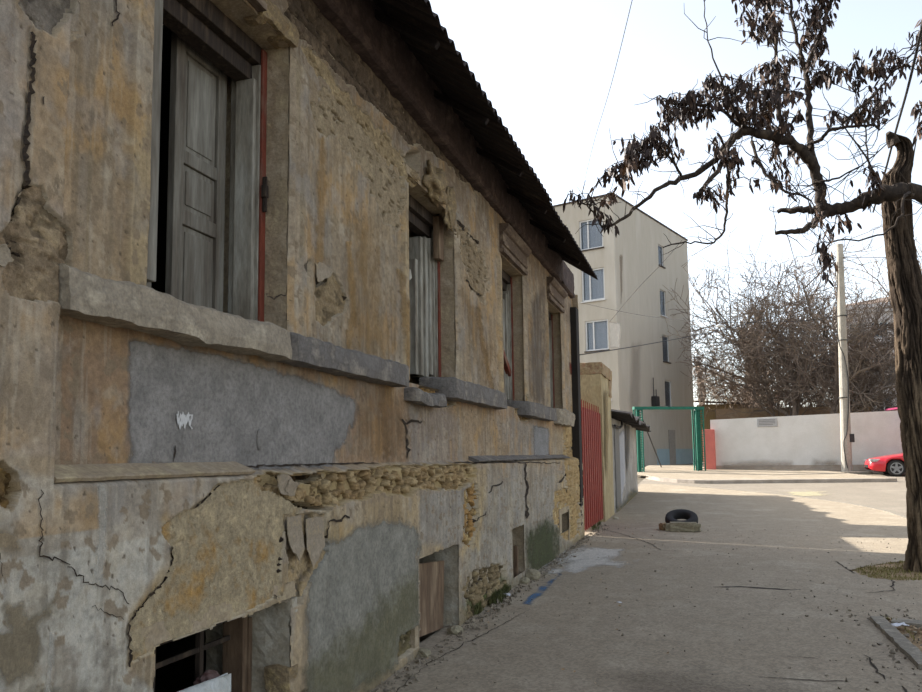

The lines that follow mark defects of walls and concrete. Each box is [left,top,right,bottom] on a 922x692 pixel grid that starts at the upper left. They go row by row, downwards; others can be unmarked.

spalling [18,0,84,42]
crack [6,31,45,257]
spalling [301,47,408,181]
spalling [0,185,68,302]
spalling [304,260,346,326]
spalling [455,223,489,304]
spalling [0,468,11,508]
crack [38,490,174,667]
spalling [257,463,477,597]
spalling [462,564,507,620]
crack [454,460,566,527]
spalling [553,426,581,540]